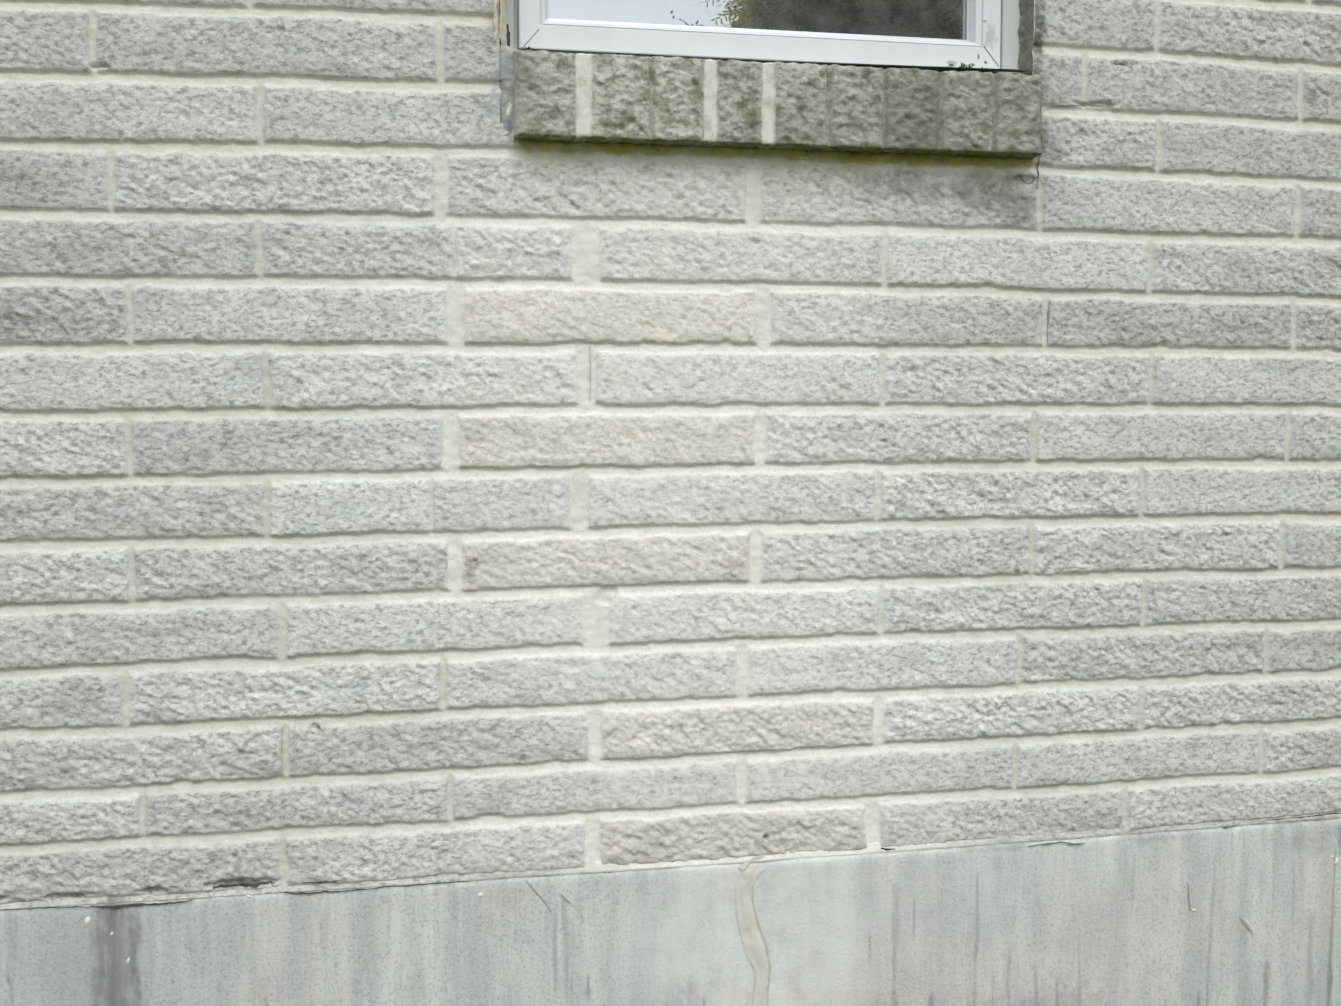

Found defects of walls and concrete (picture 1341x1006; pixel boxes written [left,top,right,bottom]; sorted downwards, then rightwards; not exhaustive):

water stain [94,899,140,1006]
crack [735,855,771,1006]